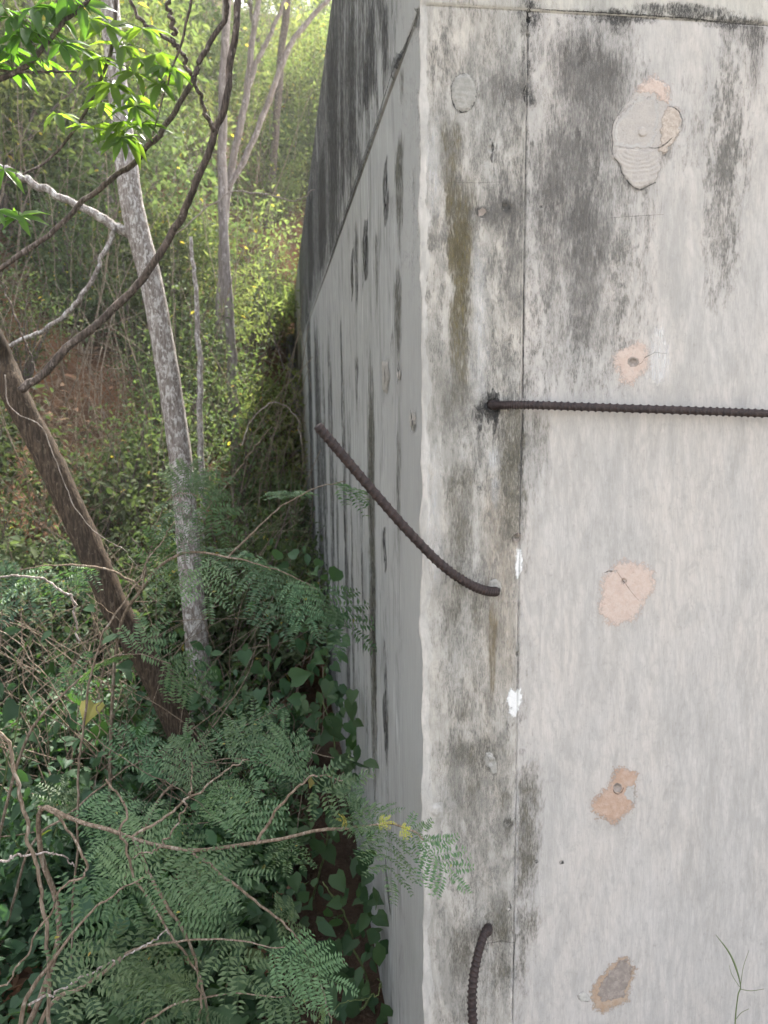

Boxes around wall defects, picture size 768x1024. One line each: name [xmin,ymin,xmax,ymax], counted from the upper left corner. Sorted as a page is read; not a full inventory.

spalling [608,73,683,192]
leakage [395,140,403,249]
leakage [392,279,401,352]
leakage [295,0,392,780]
spalling [612,339,666,388]
leakage [426,0,764,995]
spalling [598,557,657,628]
spalling [591,766,640,827]
spalling [578,956,638,1015]